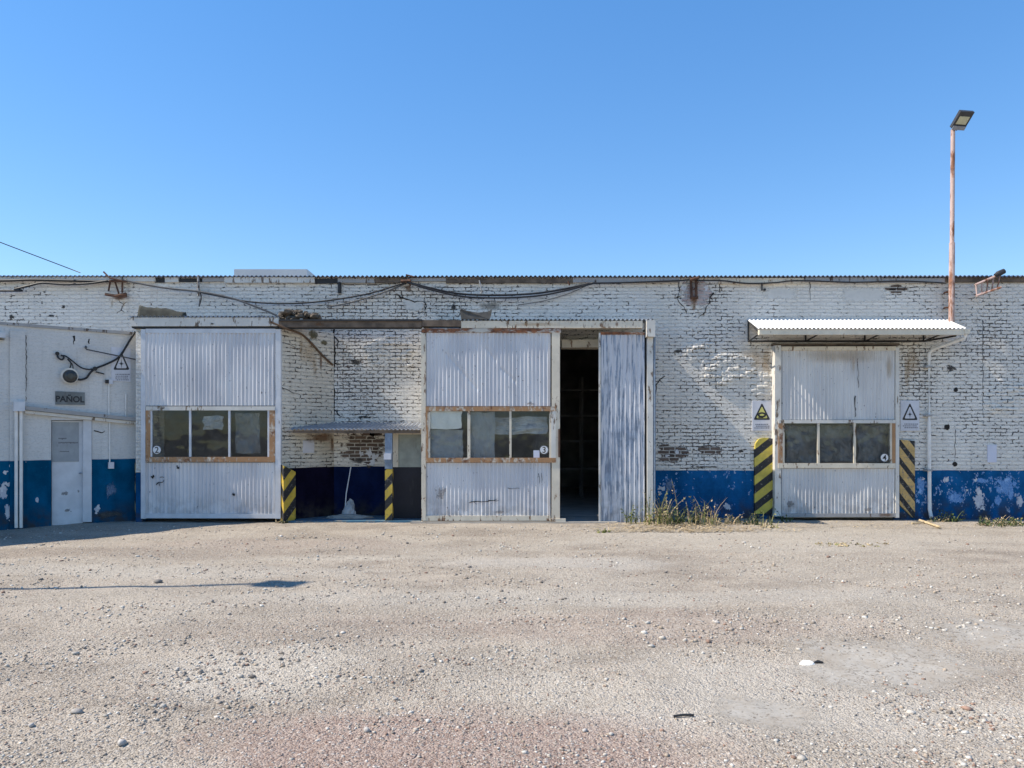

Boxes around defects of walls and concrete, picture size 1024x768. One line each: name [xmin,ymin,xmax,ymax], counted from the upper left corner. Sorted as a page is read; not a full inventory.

spalling [341,416,385,468]
spalling [658,444,723,468]
peeling [0,465,10,521]
peeling [943,462,1024,512]